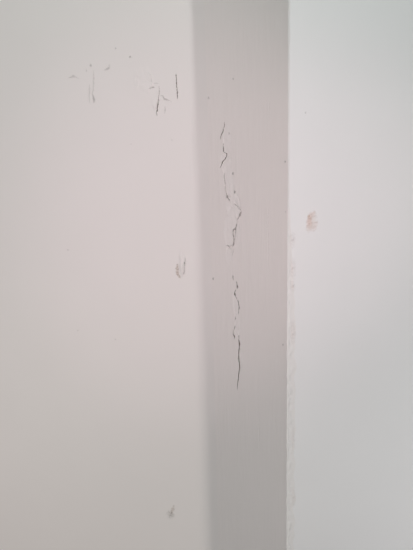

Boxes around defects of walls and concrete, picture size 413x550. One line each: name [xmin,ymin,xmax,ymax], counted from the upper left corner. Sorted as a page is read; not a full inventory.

crack [157,75,179,115]
crack [233,286,244,390]